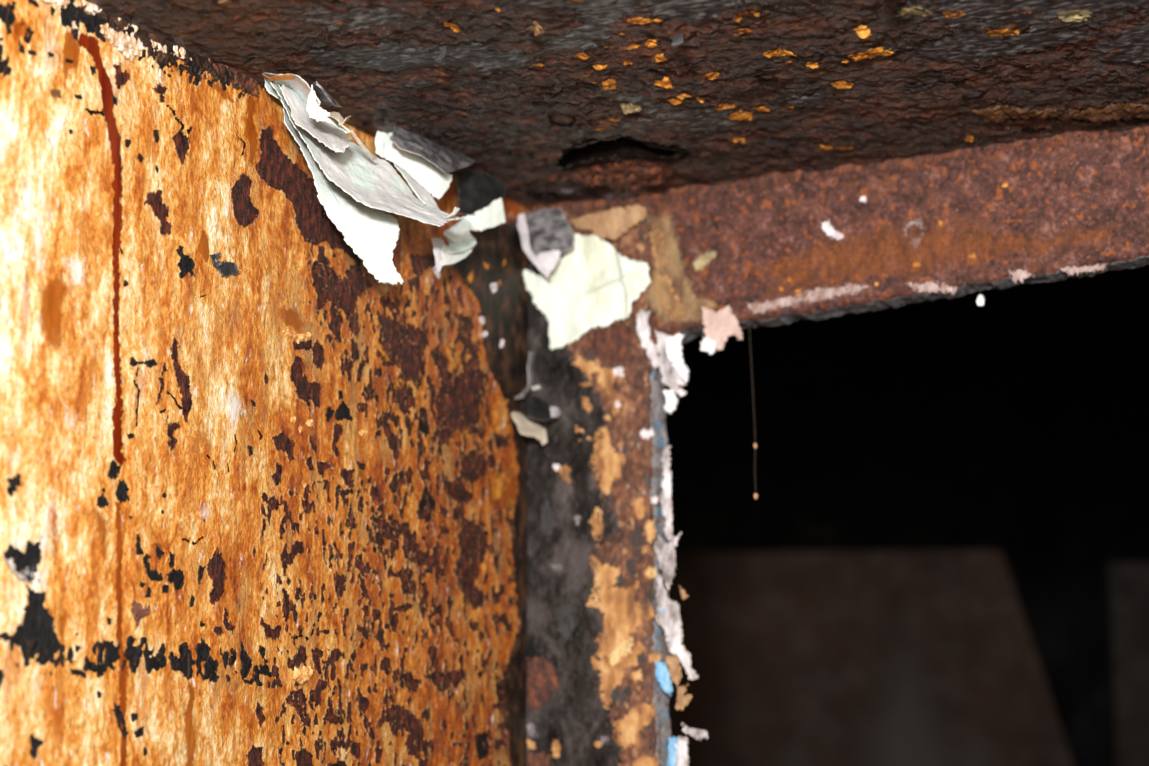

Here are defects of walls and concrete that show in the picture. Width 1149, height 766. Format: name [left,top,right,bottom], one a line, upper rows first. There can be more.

rust [80,5,266,165]
rust [42,270,64,348]
rust [63,31,144,466]
rust [97,502,128,766]
peeling [0,534,290,698]
spalling [143,189,172,236]
spalling [130,334,192,451]
rust [258,239,518,766]
peeling [230,72,689,639]
peeling [654,445,708,766]
peeling [700,305,743,355]
rust [530,102,1149,324]